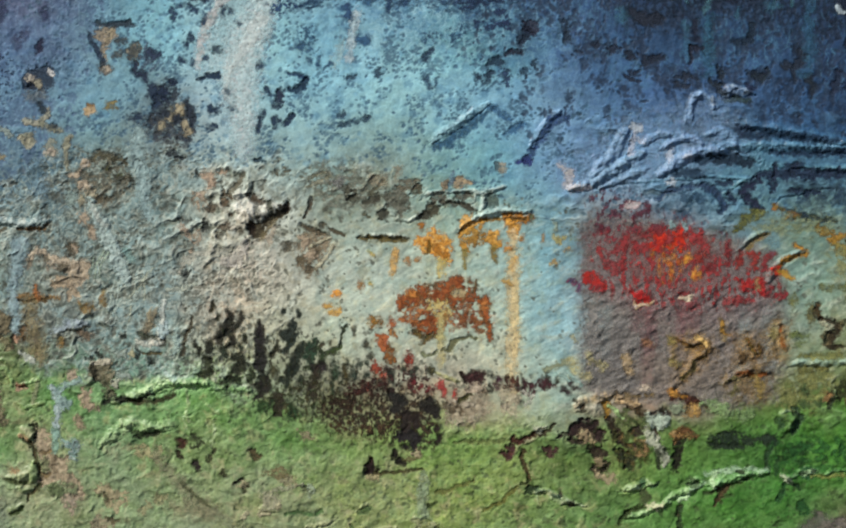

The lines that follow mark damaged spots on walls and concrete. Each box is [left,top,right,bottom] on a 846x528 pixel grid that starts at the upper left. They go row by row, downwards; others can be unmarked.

peeling [88,19,223,160]
spalling [256,86,296,133]
spalling [305,161,474,222]
peeling [177,169,335,279]
corrosion [323,290,342,316]
corrosion [368,212,534,395]
leakage [135,282,446,455]
corrosion [407,377,457,401]
crack [617,509,631,525]
crack [676,504,684,528]
crack [713,484,729,507]
crack [775,481,810,515]